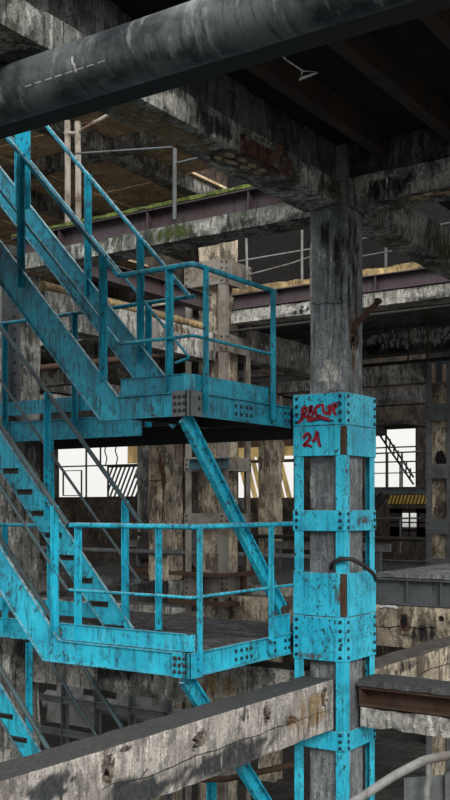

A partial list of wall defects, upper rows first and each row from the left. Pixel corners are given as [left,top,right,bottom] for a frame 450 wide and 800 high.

damp [178,218,226,236]
damp [291,215,359,319]
spalling [397,614,409,632]
spalling [102,745,132,784]
spalling [193,730,207,748]
crack [101,708,332,790]